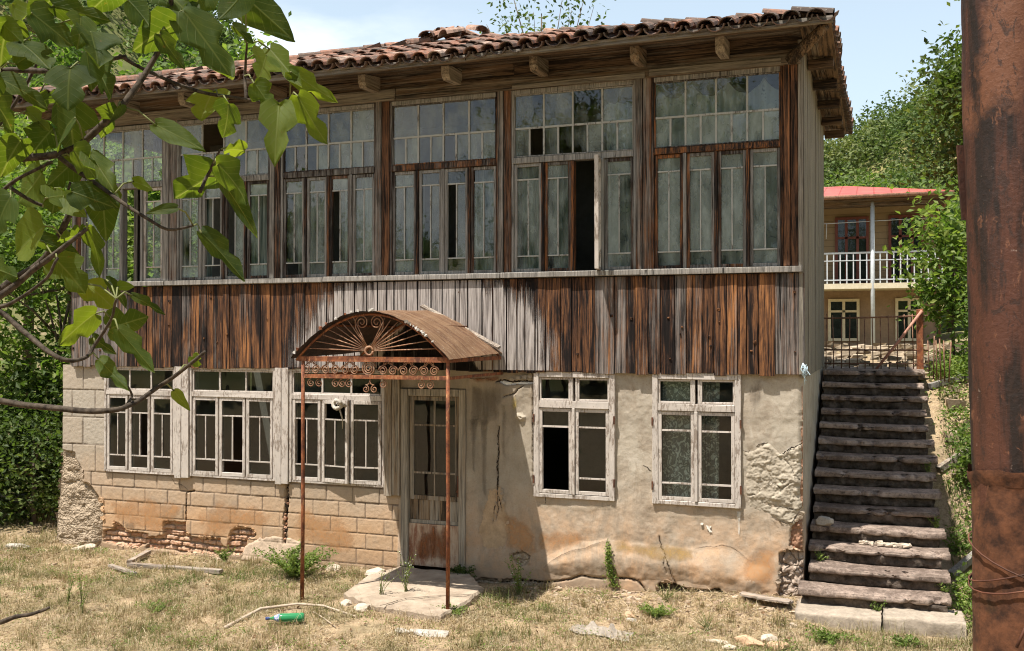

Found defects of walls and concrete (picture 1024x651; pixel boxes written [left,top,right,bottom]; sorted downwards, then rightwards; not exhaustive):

spalling [54,450,256,556]
crack [282,485,291,540]
corrosion [417,527,446,558]
crack [493,426,502,521]
crack [470,377,546,503]
spalling [773,386,805,597]